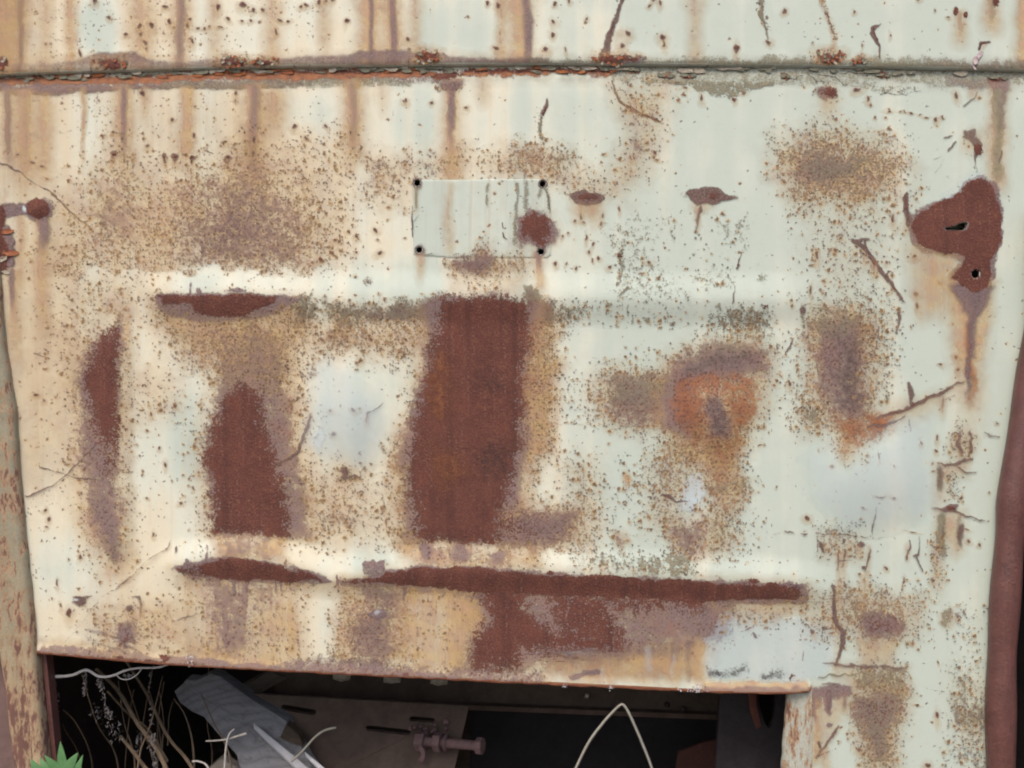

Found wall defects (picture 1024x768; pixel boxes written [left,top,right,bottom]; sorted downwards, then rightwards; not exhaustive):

rust [358,0,400,52]
rust [901,81,1009,405]
rust [607,526,629,551]
rust [936,604,985,645]